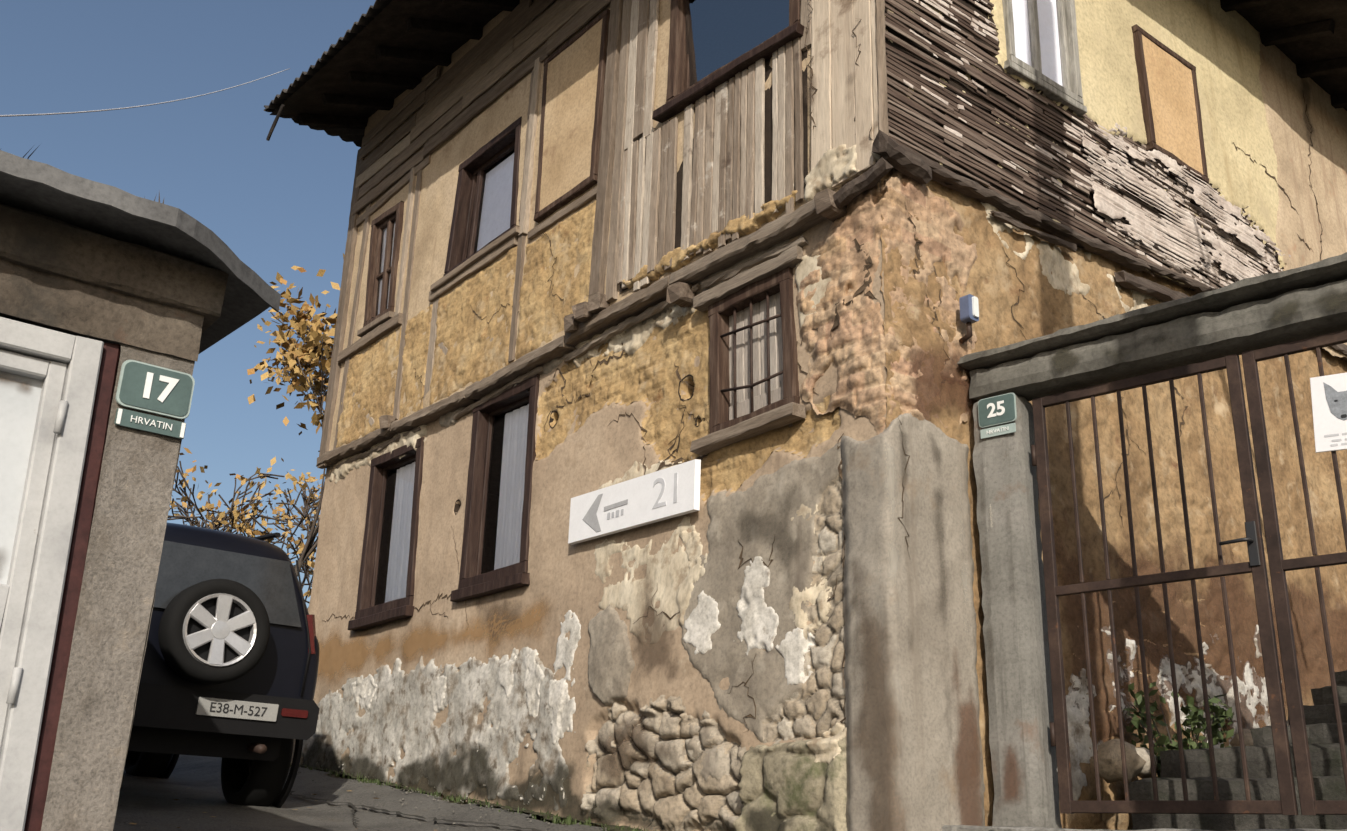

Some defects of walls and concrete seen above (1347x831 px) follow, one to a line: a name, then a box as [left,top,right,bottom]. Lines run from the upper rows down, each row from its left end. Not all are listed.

spalling [480,0,1291,506]
crack [1233,94,1323,259]
crack [544,335,625,430]
crack [610,363,709,475]
peeling [679,528,721,655]
flaking render [736,475,847,764]
peeling [300,610,581,811]
flaking render [581,695,746,831]
leakage [859,623,904,831]